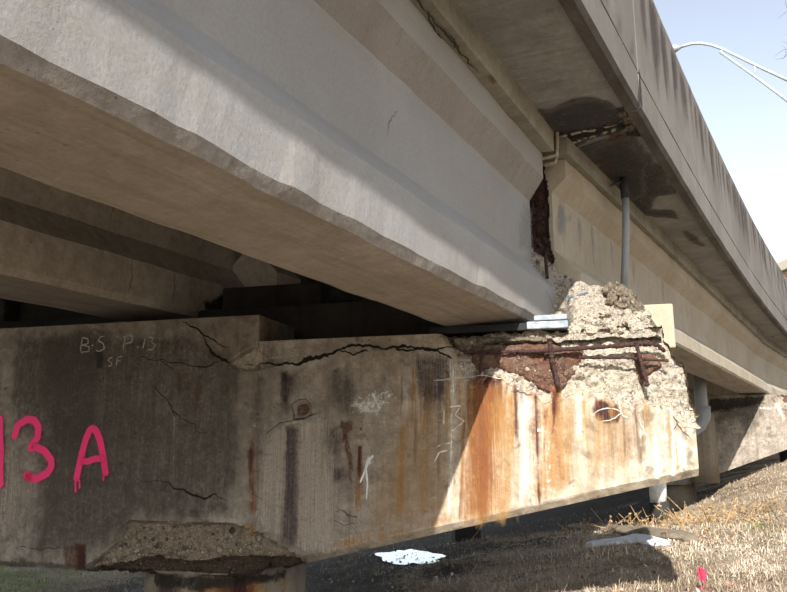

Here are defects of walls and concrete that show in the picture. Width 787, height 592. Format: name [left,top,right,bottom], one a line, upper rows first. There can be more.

crack [417,0,478,72]
water stain [538,98,678,219]
crack [134,320,456,369]
spalling [448,203,701,429]
crack [134,480,228,502]
spalling [84,398,338,578]
rust [341,420,362,508]
rust [458,372,517,521]
rust [531,388,571,502]
rust [593,400,620,423]